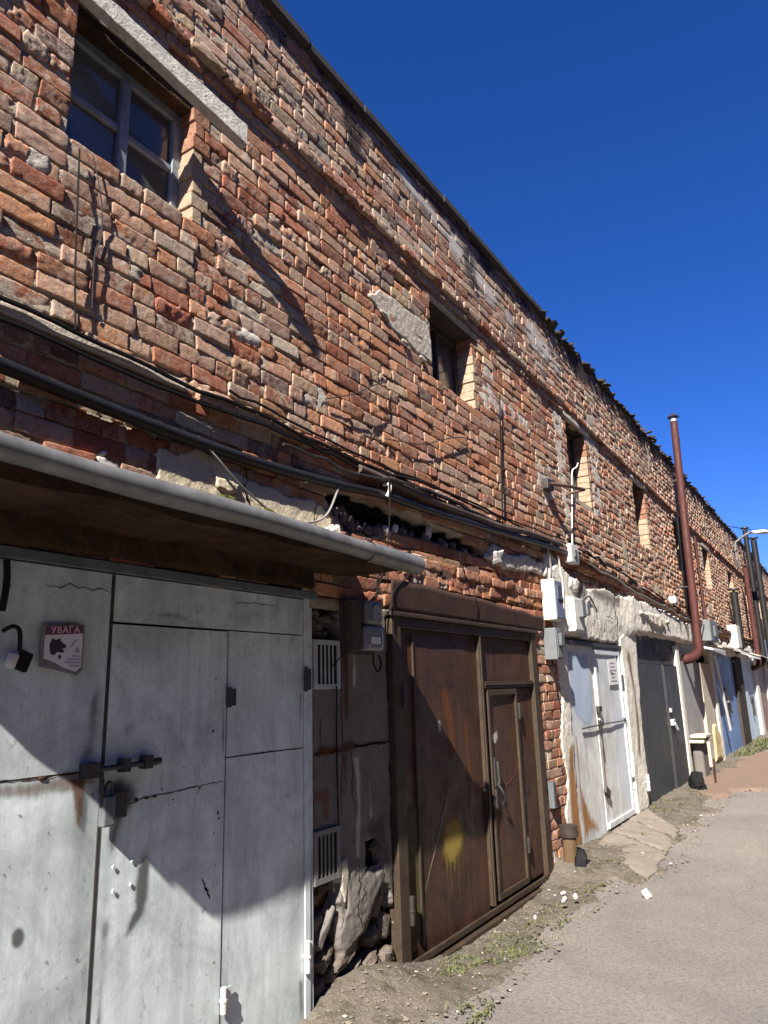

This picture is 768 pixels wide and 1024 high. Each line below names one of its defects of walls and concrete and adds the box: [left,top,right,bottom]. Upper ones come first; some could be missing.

peeling [154,448,558,576]
crack [46,583,111,594]
crack [127,644,390,817]
corrosion [71,780,84,826]
corrosion [569,739,595,846]